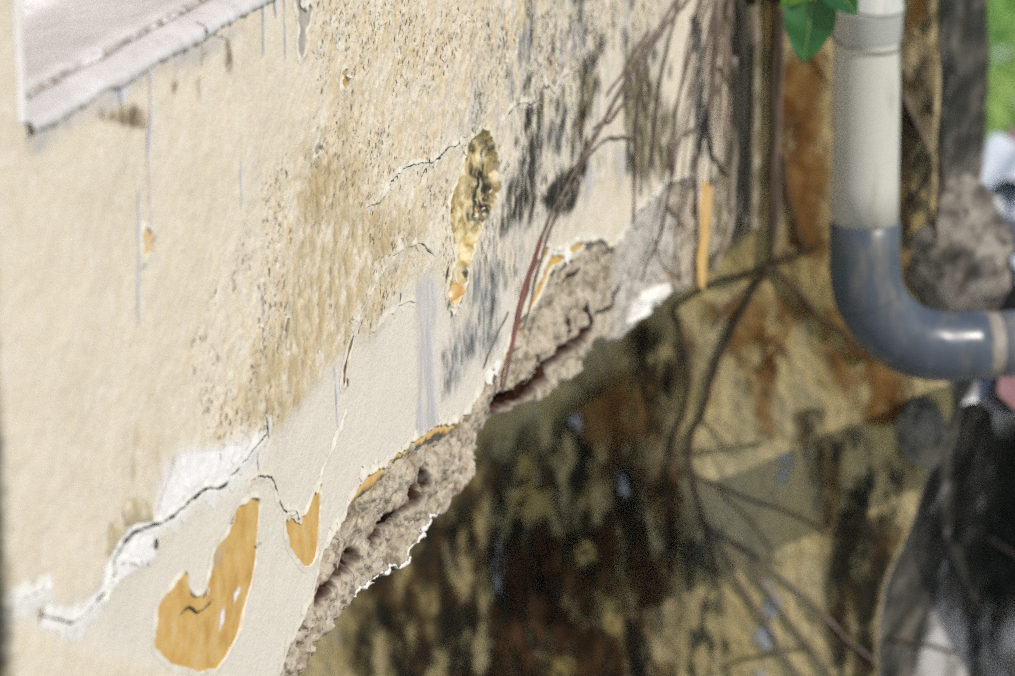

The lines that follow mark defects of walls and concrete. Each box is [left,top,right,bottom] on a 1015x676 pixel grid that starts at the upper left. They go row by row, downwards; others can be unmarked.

peeling [78,531,160,610]
peeling [138,220,158,270]
crack [6,393,303,642]
peeling [152,491,263,676]
peeling [157,154,295,515]
crack [319,406,348,478]
water stain [444,266,507,392]
spalling [279,167,713,676]
water stain [353,327,730,676]
water stain [500,0,607,235]
water stain [709,0,763,255]
water stain [794,381,1015,676]